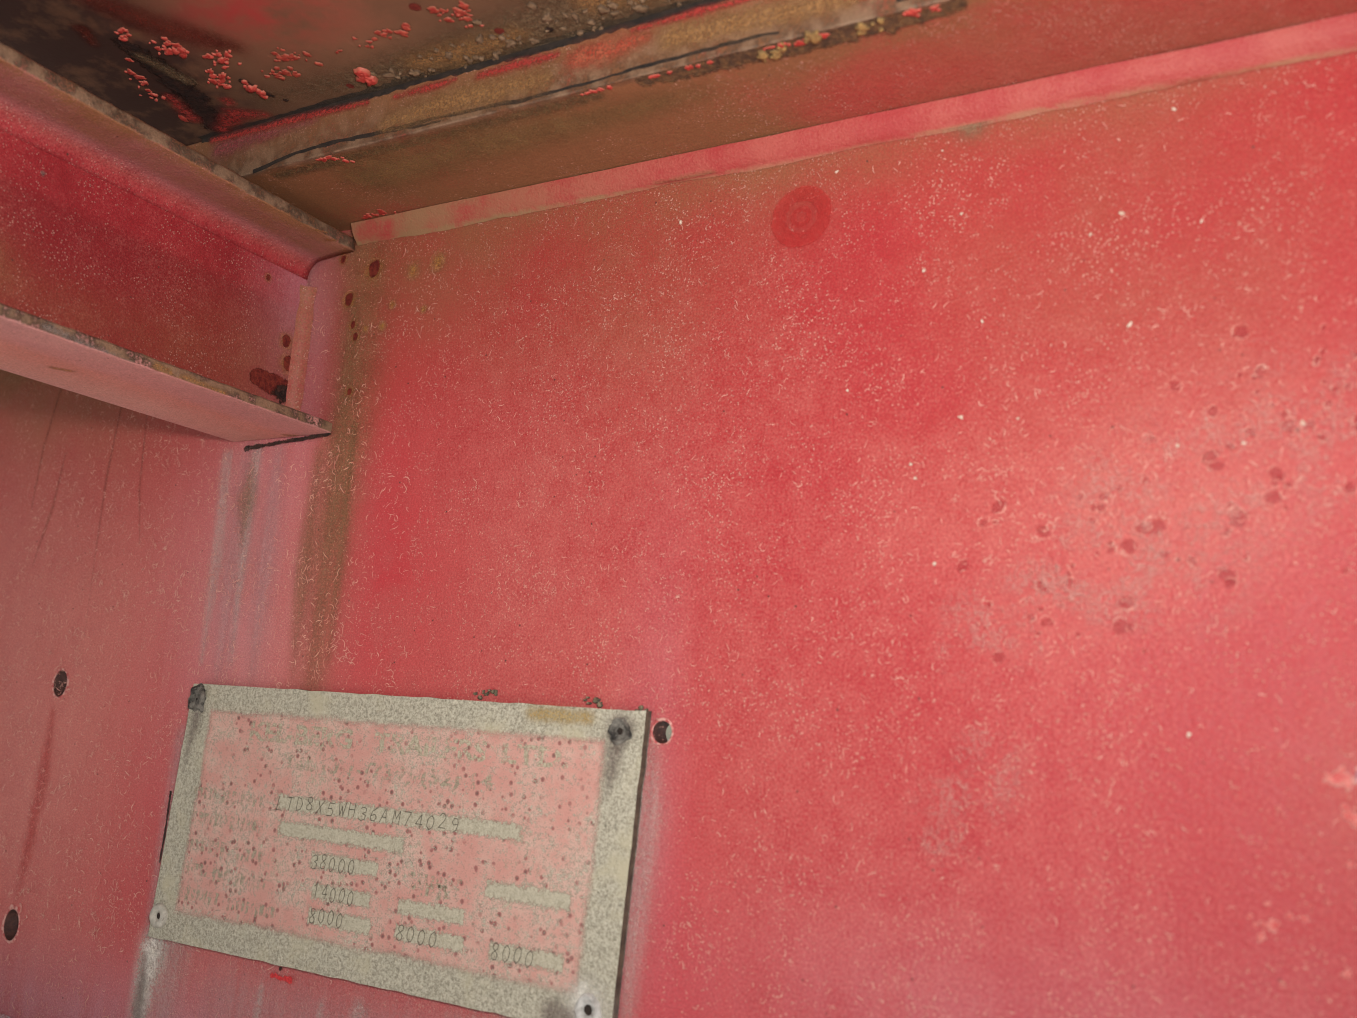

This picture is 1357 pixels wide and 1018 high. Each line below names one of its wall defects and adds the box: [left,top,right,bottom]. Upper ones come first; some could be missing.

peeling [114,27,132,42]
peeling [335,22,411,54]
peeling [427,0,484,28]
peeling [477,0,748,79]
rust [756,42,787,63]
rust [804,29,822,45]
rust [854,17,884,36]
peeling [124,58,199,123]
rust [111,38,231,131]
peeling [149,37,378,156]
rust [368,260,380,278]
rust [345,293,359,341]